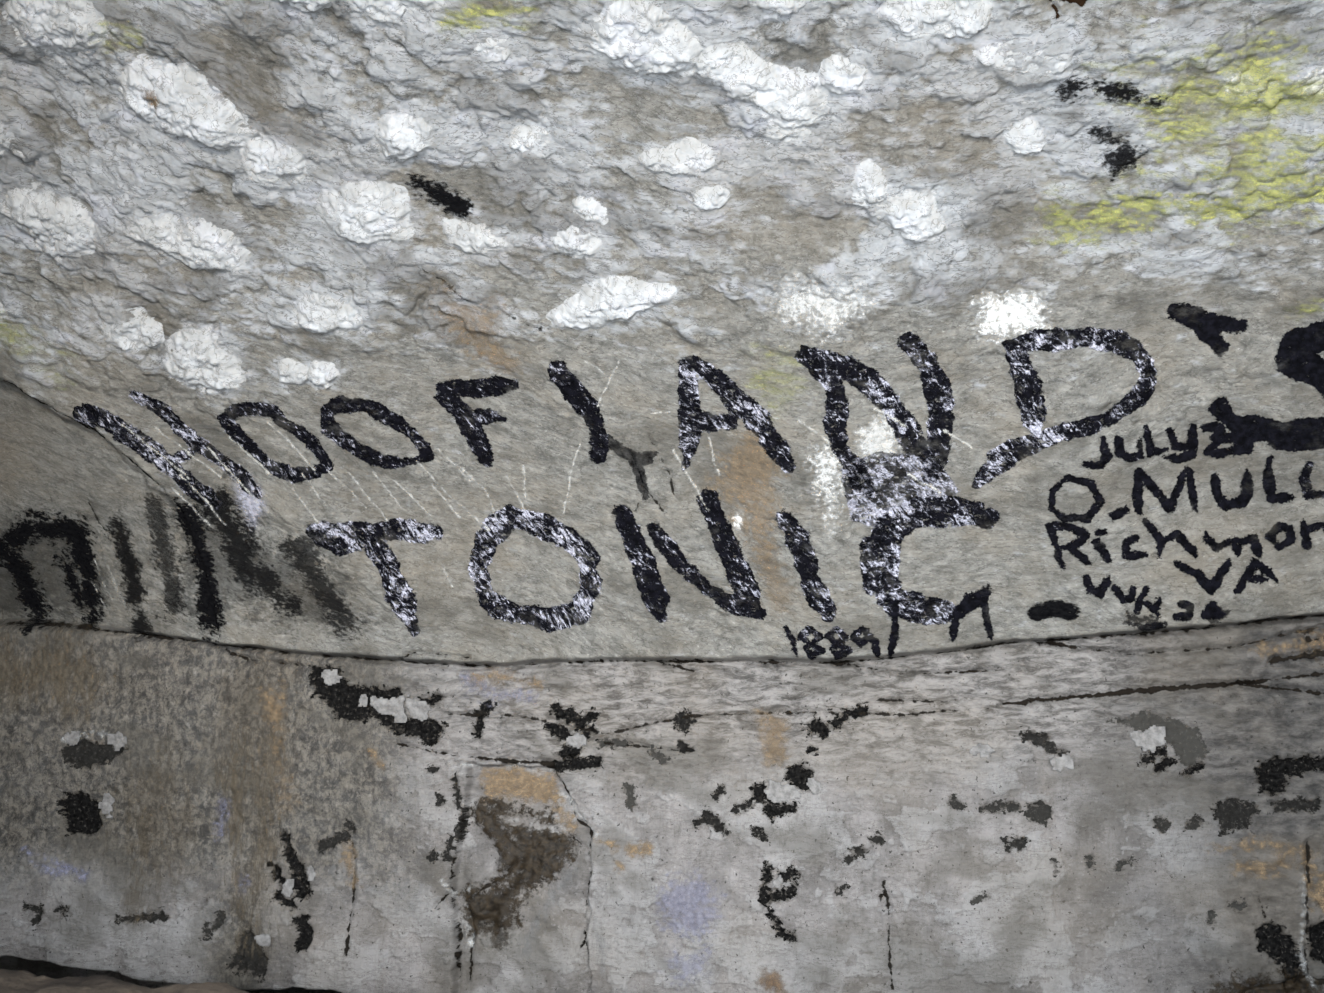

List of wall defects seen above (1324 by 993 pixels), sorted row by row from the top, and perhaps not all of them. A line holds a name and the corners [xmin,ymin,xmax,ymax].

crack [1049,0,1087,19]
crack [397,743,593,991]